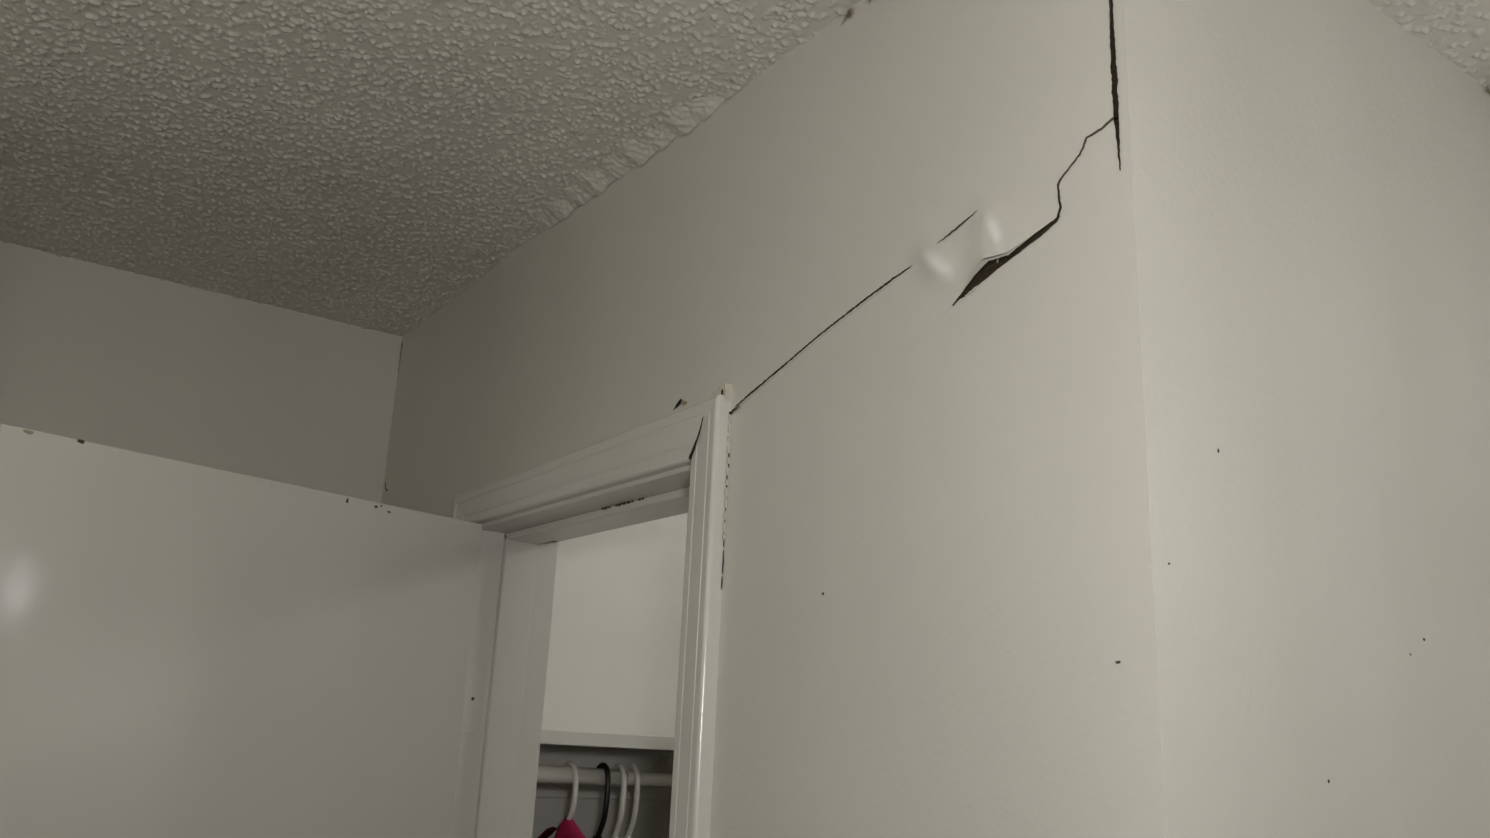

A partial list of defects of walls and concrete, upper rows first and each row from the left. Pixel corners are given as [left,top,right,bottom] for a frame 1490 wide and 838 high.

crack [952,0,1121,306]
crack [689,210,977,461]